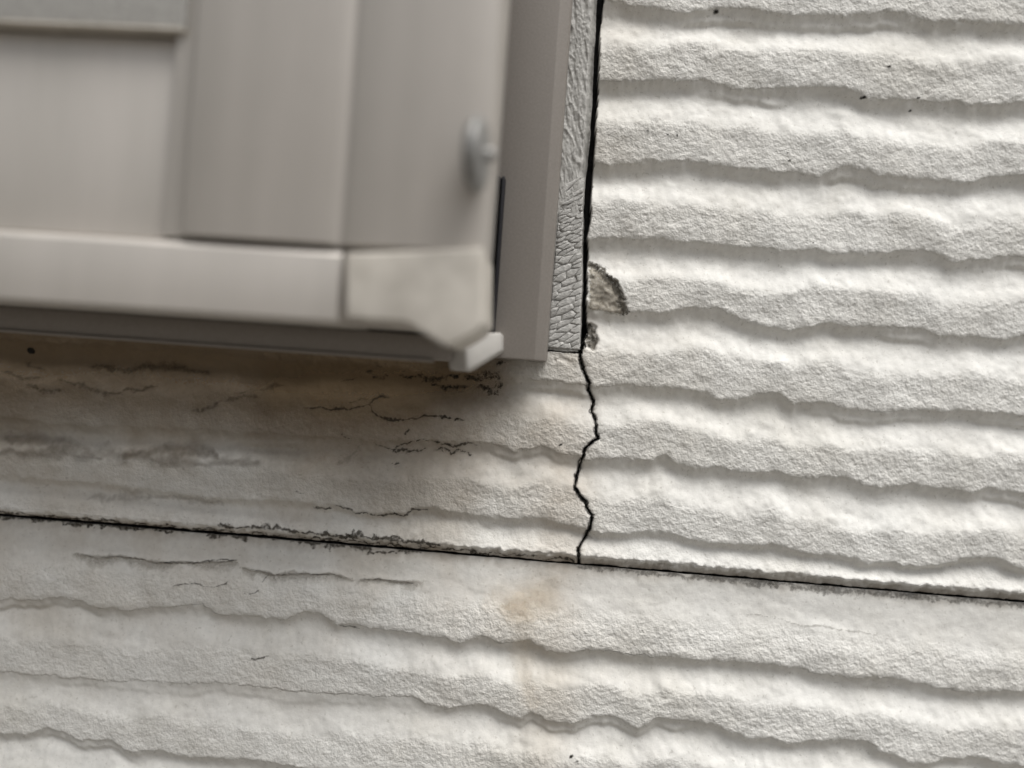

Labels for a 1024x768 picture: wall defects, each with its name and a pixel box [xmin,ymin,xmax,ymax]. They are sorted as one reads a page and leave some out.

peeling [548,177,630,351]
crack [309,379,471,464]
crack [569,339,600,562]